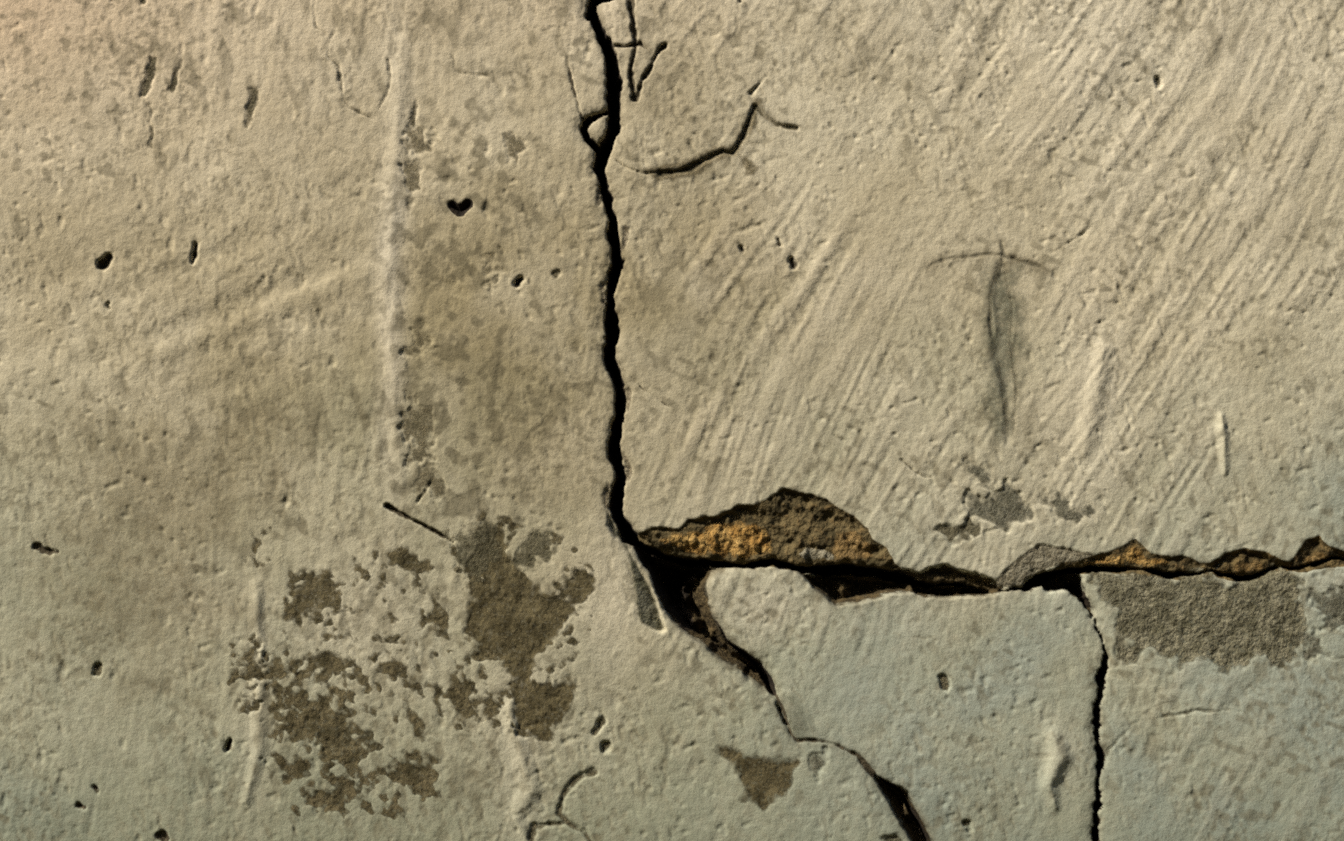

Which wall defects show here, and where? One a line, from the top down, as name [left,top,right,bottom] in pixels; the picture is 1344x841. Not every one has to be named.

crack [568,0,1344,841]
peeling [609,488,1344,673]
peeling [936,461,1094,542]
crack [529,770,597,841]